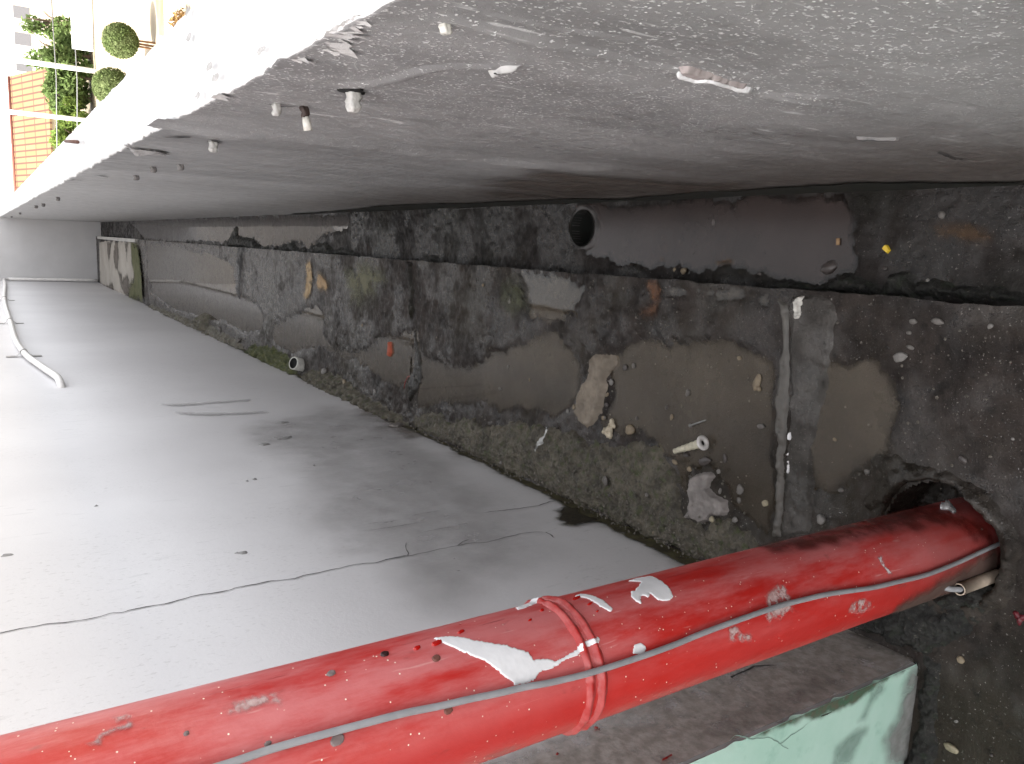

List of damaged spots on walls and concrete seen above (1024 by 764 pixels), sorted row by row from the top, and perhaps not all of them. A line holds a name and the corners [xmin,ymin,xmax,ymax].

flaking render [291,14,371,64]
peeling [676,66,760,94]
water stain [107,241,131,295]
water stain [558,501,599,525]
crack [1,501,556,633]